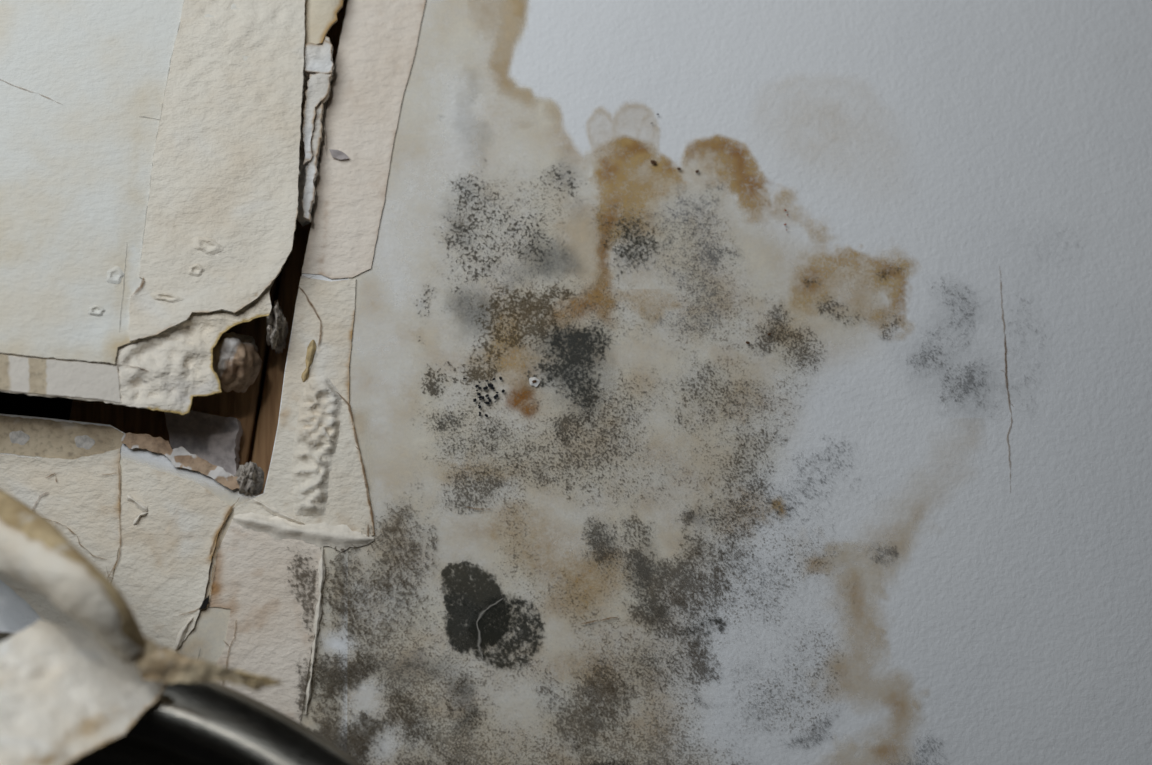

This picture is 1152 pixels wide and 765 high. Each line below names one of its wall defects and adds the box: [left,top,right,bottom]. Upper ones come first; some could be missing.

spalling [301,36,350,222]
damp [287,0,862,765]
crack [999,265,1013,491]
crack [33,471,121,578]
peeling [0,415,231,651]
crack [178,497,240,616]
damp [177,486,248,664]
damp [811,531,906,639]